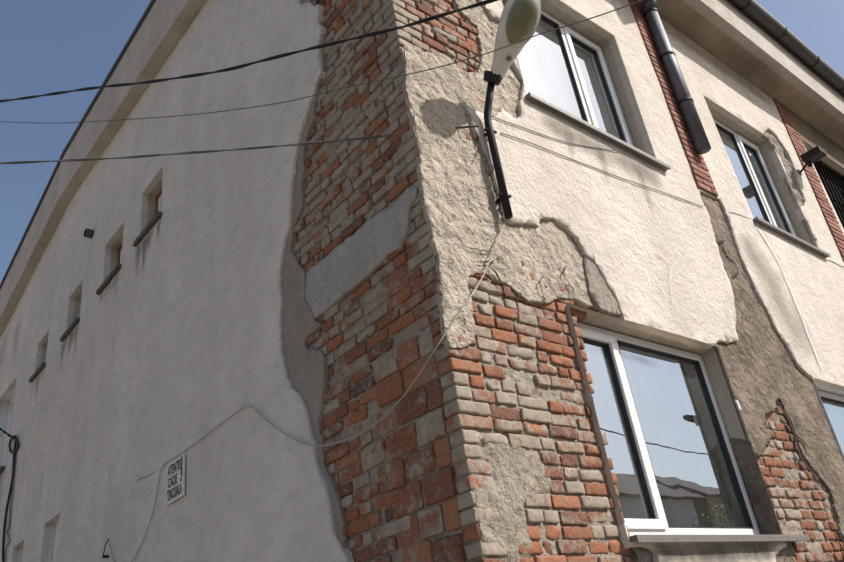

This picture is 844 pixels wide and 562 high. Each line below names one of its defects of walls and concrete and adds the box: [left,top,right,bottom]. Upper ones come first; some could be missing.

spalling [281,0,653,562]
spalling [700,193,844,562]
spalling [761,131,808,209]